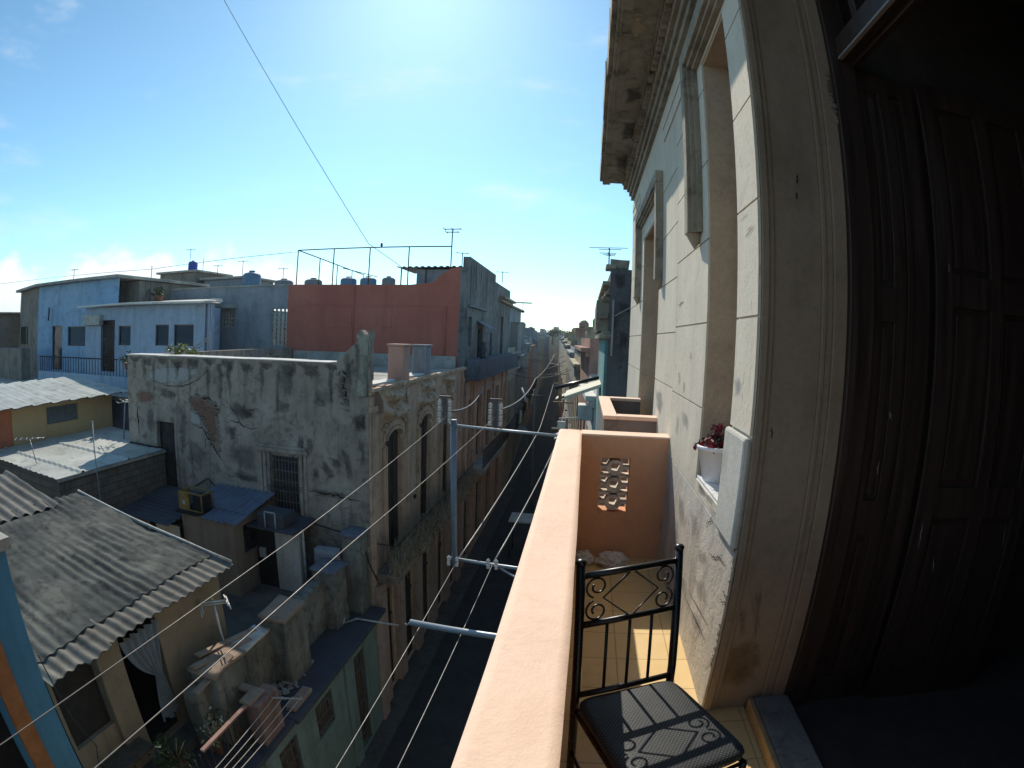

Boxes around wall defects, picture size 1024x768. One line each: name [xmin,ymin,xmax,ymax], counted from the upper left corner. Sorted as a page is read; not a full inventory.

flaking render [187,394,222,452]
crack [191,404,256,460]